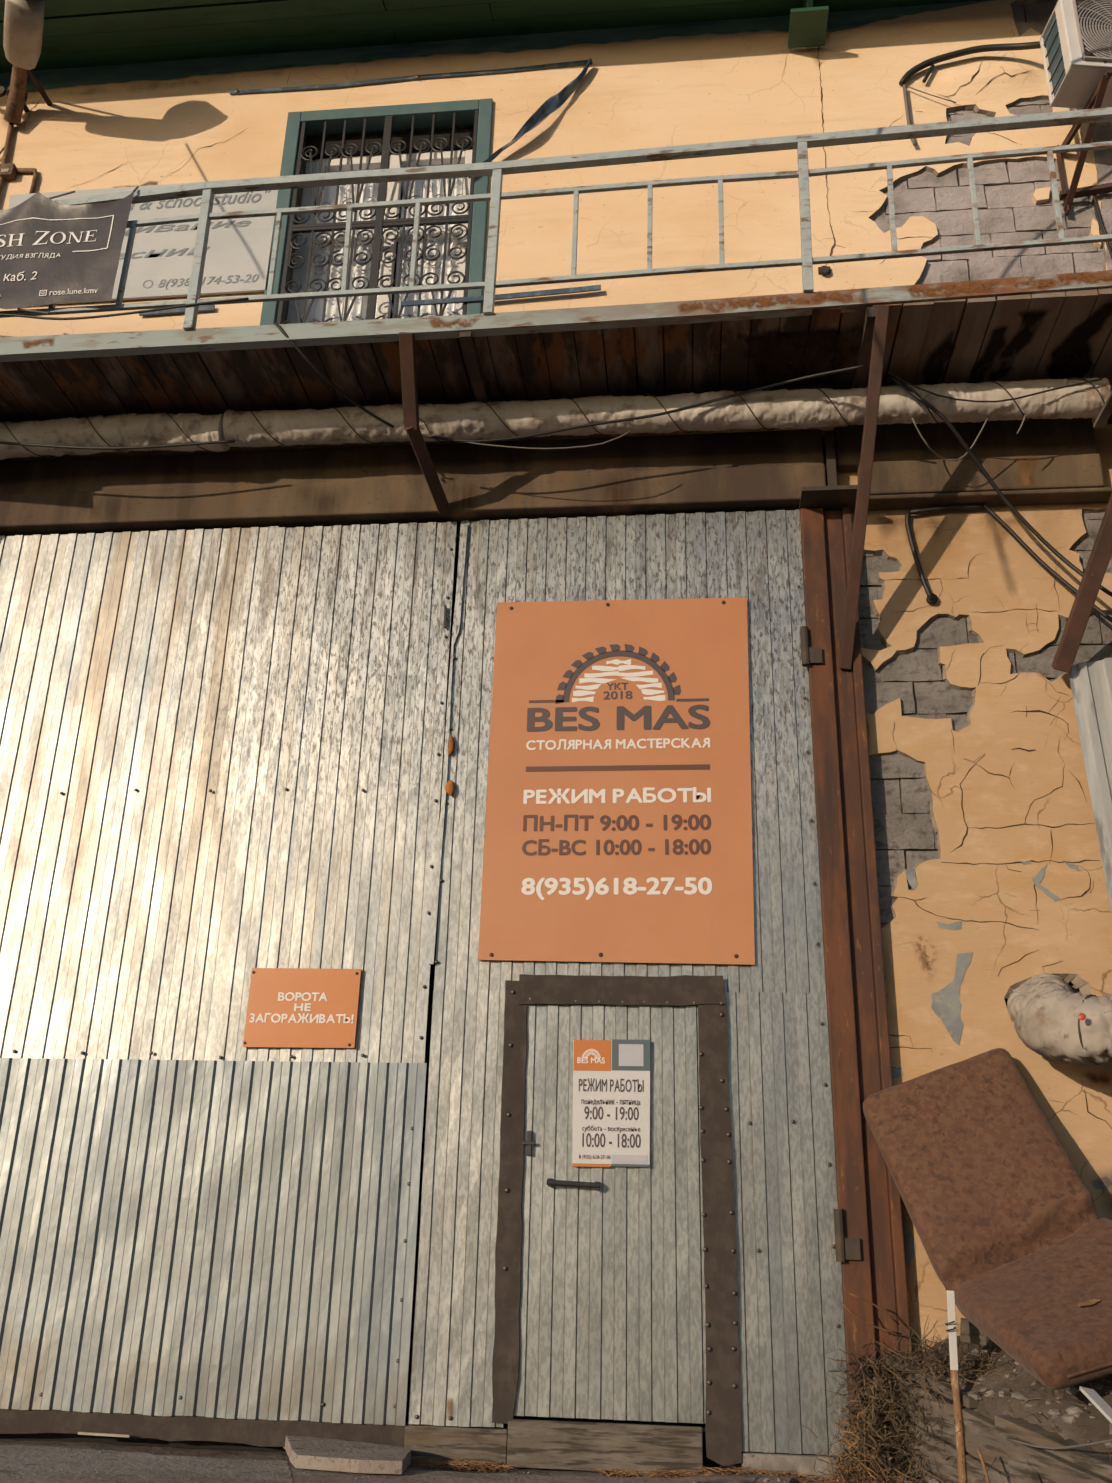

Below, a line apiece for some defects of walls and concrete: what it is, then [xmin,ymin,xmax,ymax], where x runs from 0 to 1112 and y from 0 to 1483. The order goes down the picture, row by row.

flaking render [1009,0,1058,38]
crack [946,61,1028,106]
crack [782,31,934,288]
flaking render [869,96,1112,285]
corrosion [679,292,852,312]
corrosion [909,282,994,296]
corrosion [1016,274,1112,287]
crack [881,553,982,613]
flaking render [858,550,984,732]
flaking render [1006,610,1112,682]
crack [902,576,1099,976]
flaking render [869,750,941,929]